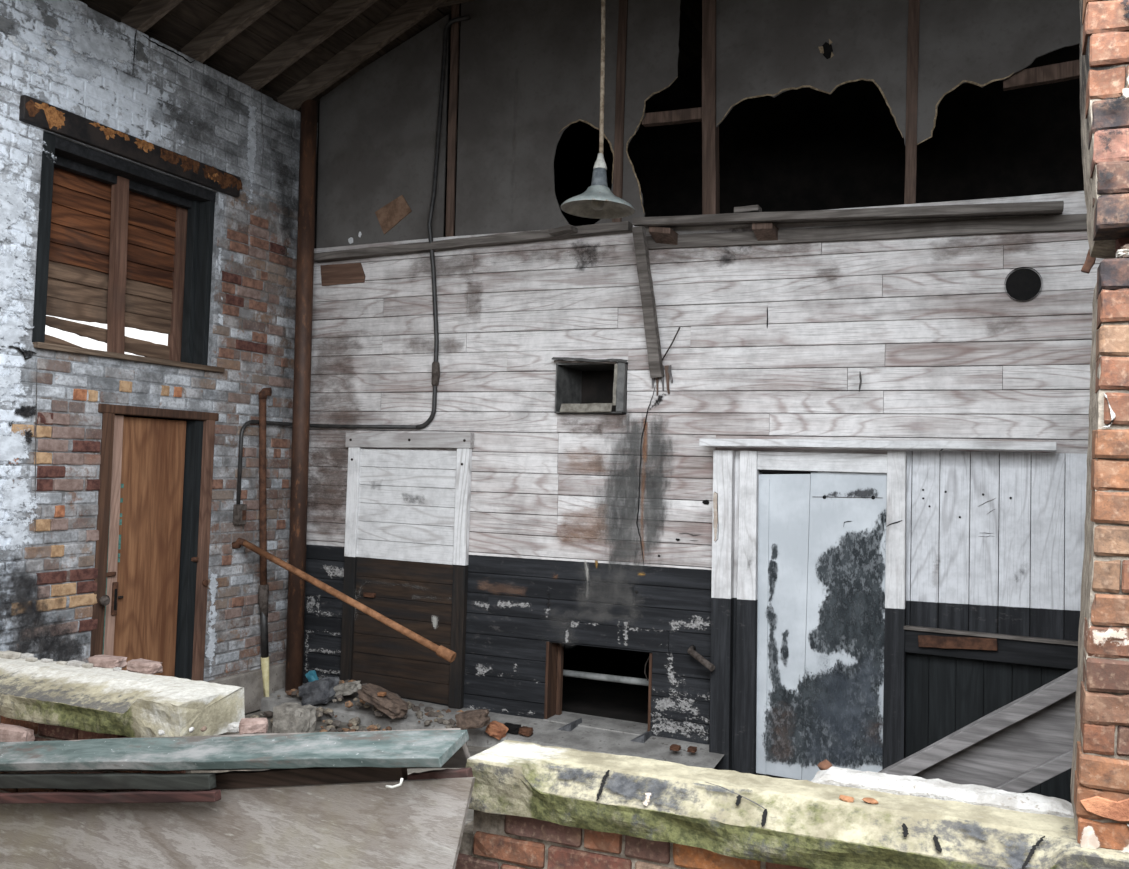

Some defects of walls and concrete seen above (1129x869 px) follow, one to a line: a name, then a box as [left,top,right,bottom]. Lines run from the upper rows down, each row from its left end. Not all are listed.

corrosion [25,99,65,130]
spalling [717,78,903,138]
spalling [917,72,1014,145]
corrosion [89,122,242,191]
water stain [602,427,661,557]
peeling [763,510,886,769]
spalling [1092,628,1127,645]
peeling [617,615,710,741]
spalling [1080,796,1129,849]